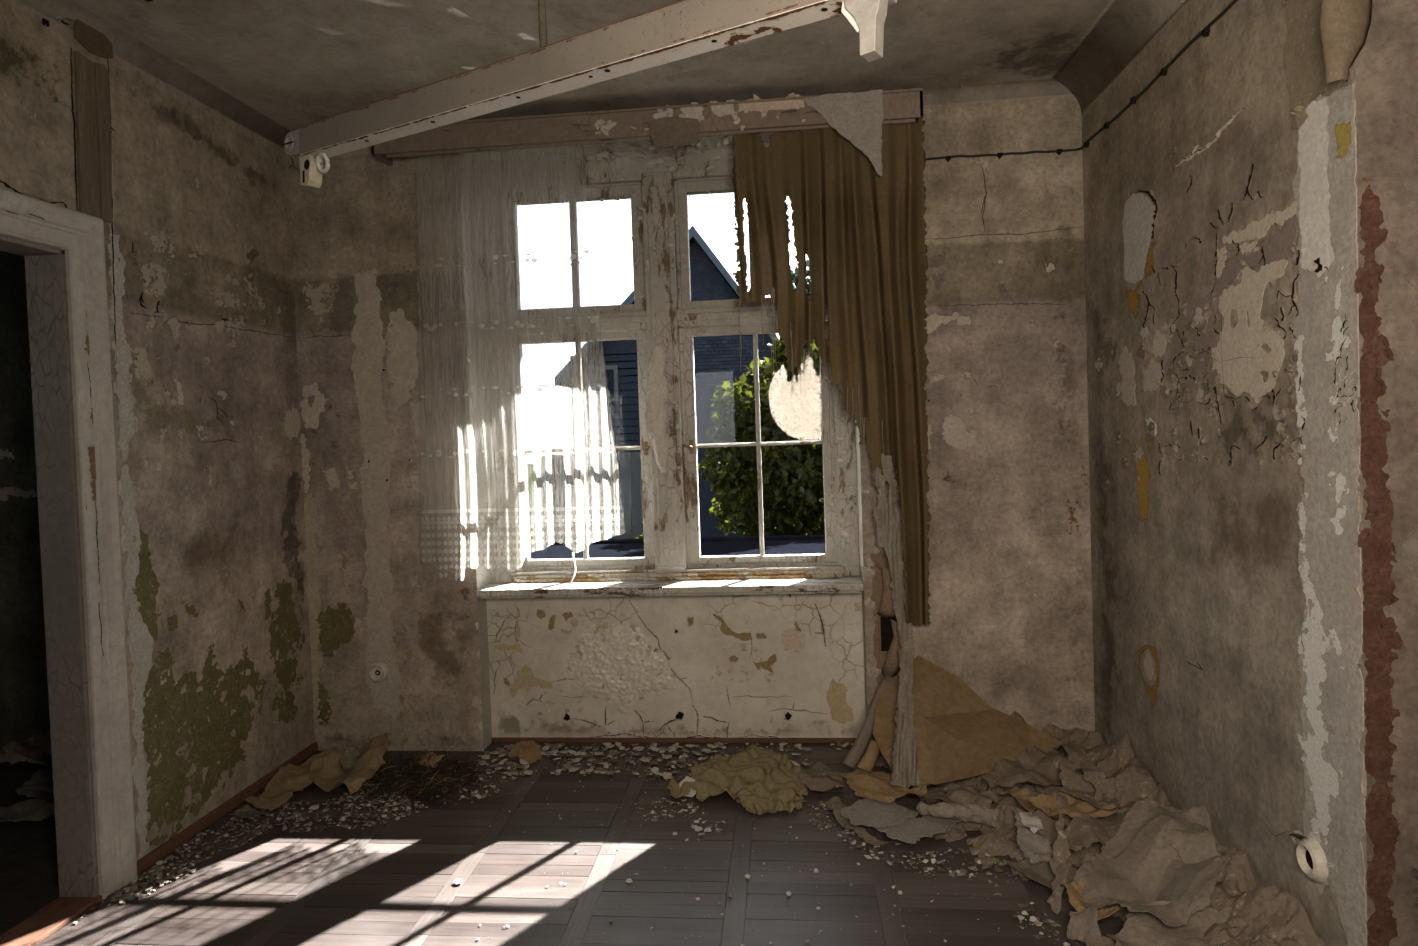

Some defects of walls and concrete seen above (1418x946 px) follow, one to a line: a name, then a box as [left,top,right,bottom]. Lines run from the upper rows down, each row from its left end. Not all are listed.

peeling [657,94,779,131]
flaking render [73,227,816,924]
flaking render [1095,78,1367,946]
crack [488,597,827,738]
peeling [826,679,854,724]